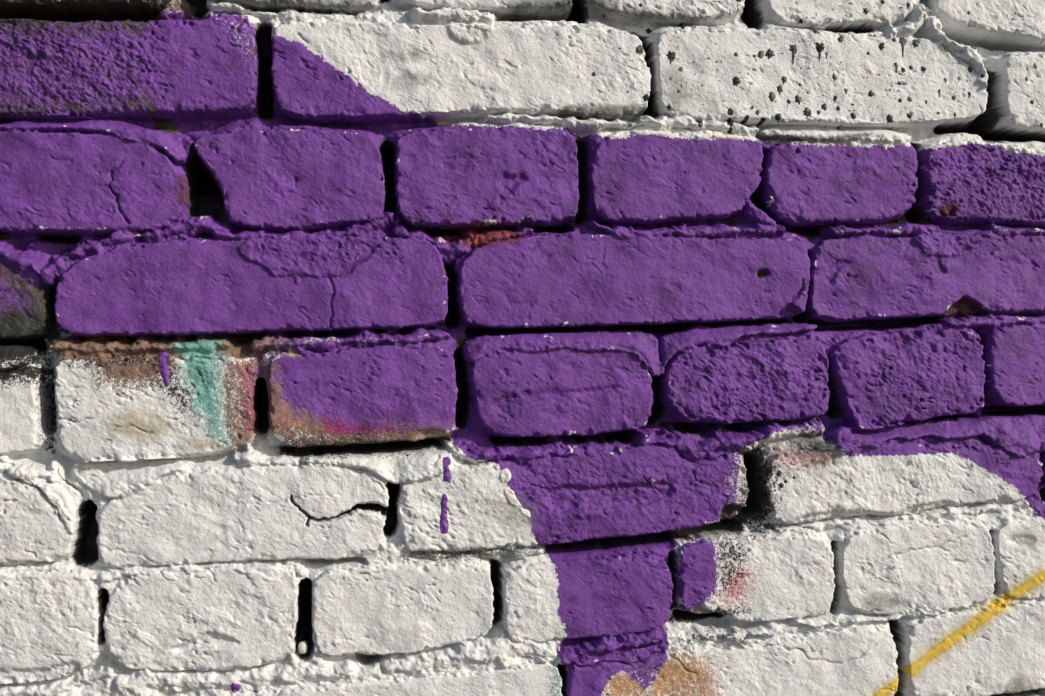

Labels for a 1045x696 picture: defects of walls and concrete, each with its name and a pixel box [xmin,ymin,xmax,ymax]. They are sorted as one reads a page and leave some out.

crack [99,494,388,566]